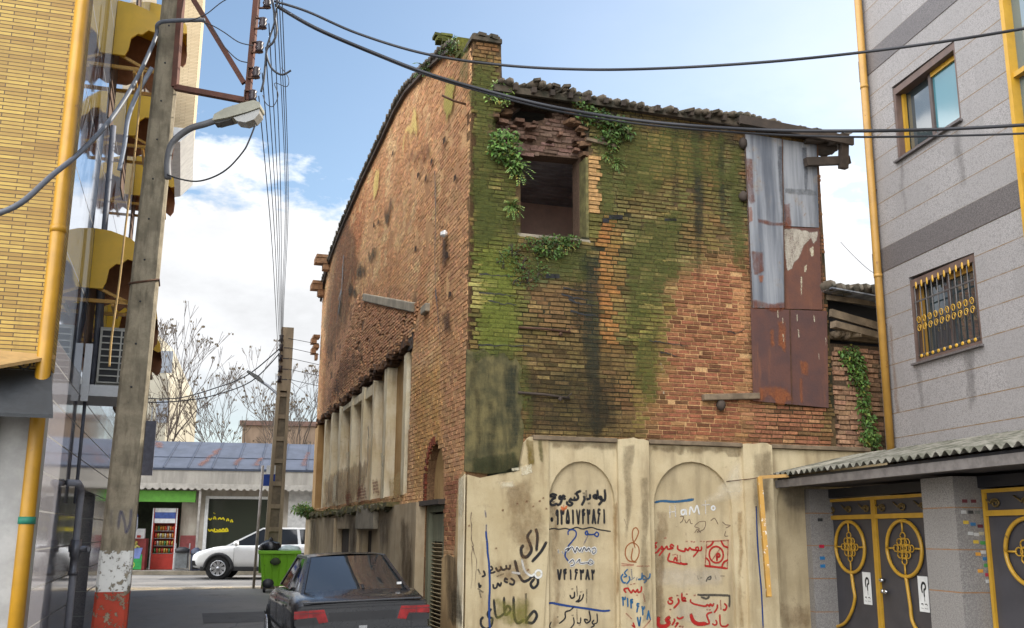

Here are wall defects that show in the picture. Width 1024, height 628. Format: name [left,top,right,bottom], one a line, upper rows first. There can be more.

spalling [484,101,597,159]
corrosion [751,204,791,229]
peeling [784,229,818,287]
leakage [473,368,542,474]